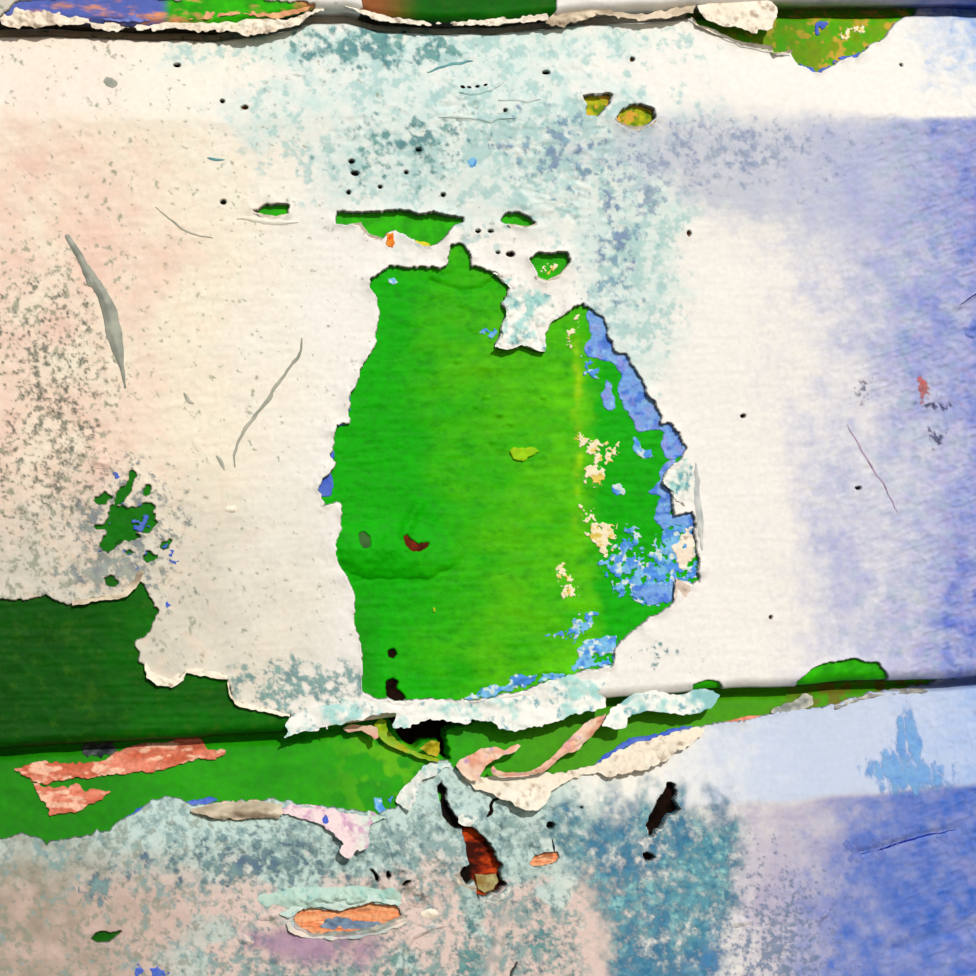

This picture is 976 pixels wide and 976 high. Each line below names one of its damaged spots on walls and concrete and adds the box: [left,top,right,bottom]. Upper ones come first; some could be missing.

peeling [0,0,324,37]
peeling [345,0,915,73]
peeling [583,95,610,116]
peeling [616,106,657,131]
peeling [0,212,935,859]
peeling [134,964,170,976]